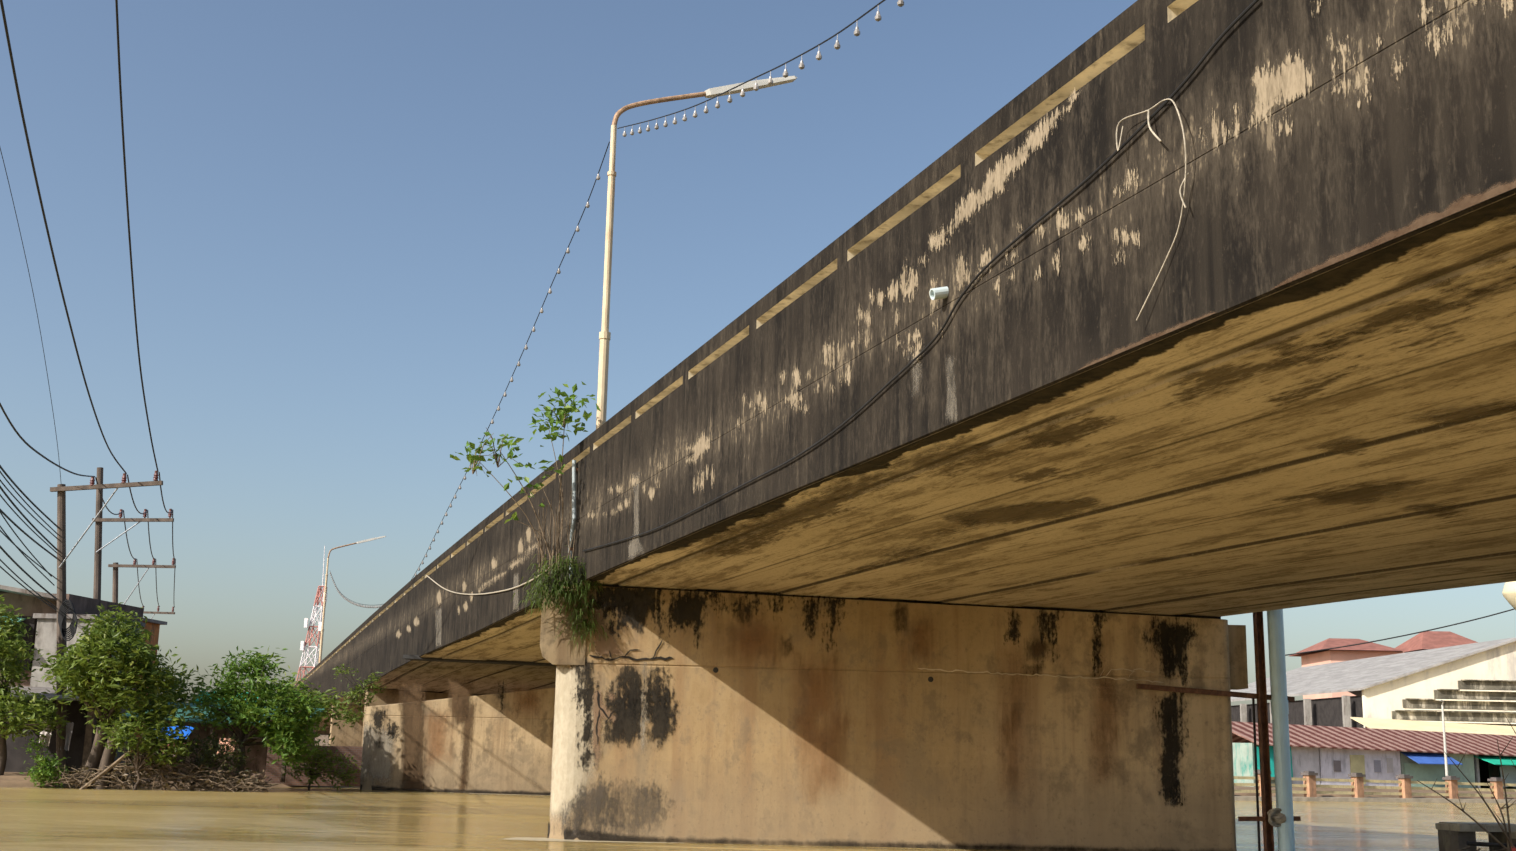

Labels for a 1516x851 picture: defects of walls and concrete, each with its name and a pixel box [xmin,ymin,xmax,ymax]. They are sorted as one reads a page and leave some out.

peeling [1418,0,1513,58]
peeling [1199,52,1312,148]
peeling [1327,34,1382,109]
peeling [737,89,1078,433]
peeling [1018,207,1092,279]
damp [582,194,1516,652]
peeling [686,431,715,493]
damp [1004,608,1064,675]
damp [1091,611,1107,677]
damp [1142,616,1197,806]
damp [360,659,764,845]
damp [783,841,1207,851]